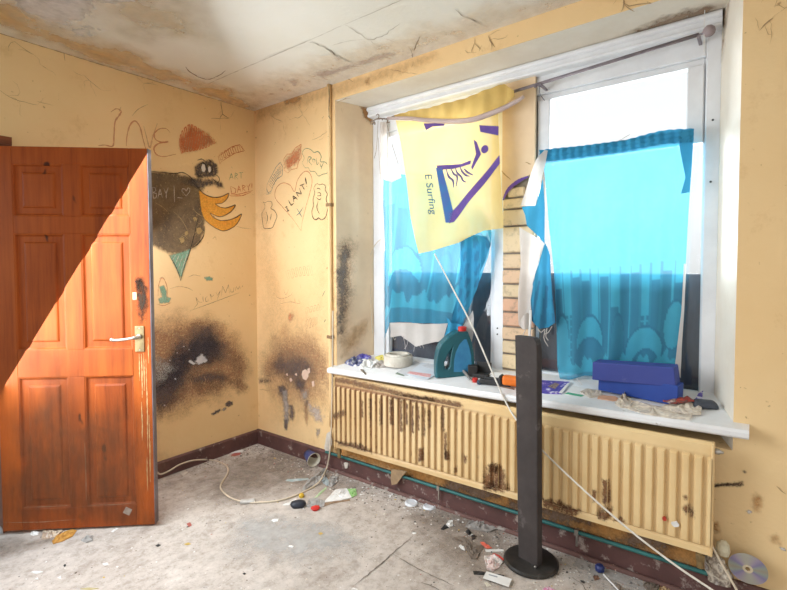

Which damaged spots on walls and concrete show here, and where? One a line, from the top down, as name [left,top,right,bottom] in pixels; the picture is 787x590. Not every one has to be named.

crack [0,0,401,130]
crack [456,10,505,53]
crack [757,1,785,42]
leakage [337,246,349,332]
rust [335,378,461,460]
rust [336,441,518,510]
rust [542,480,705,569]